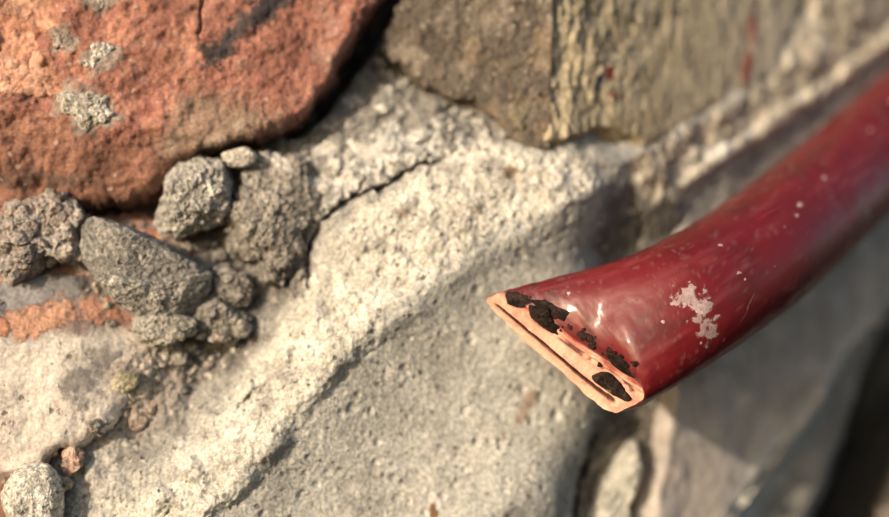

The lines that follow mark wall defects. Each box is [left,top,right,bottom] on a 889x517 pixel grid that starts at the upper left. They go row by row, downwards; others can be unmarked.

crack [305,161,434,278]
spalling [0,292,130,343]